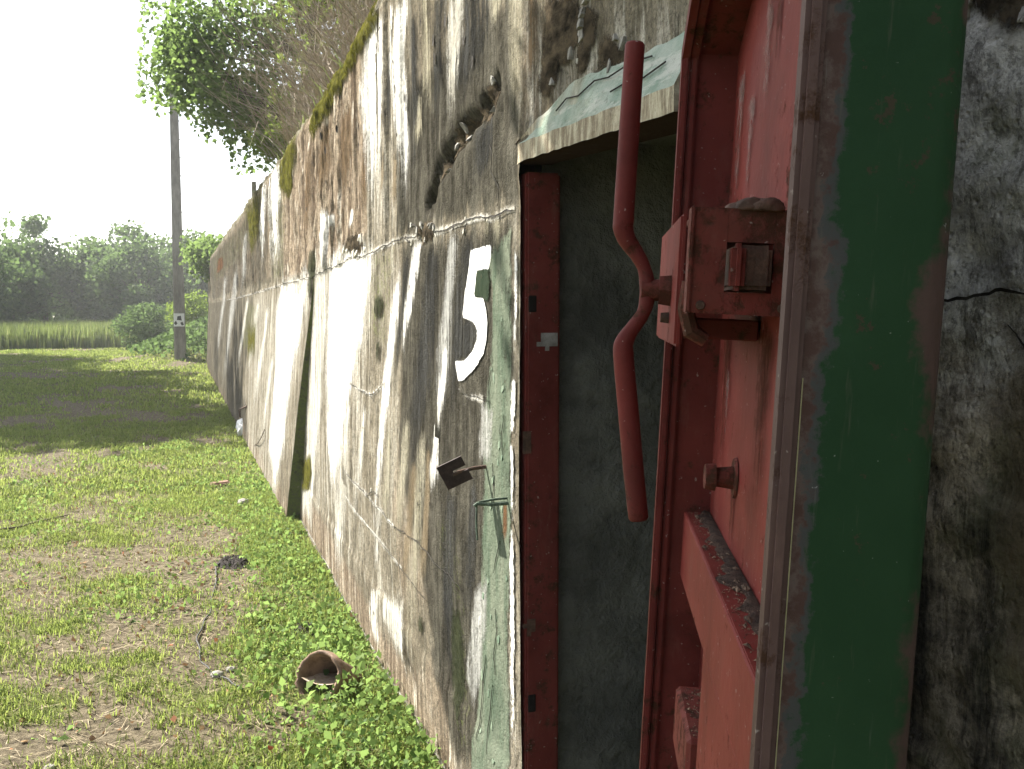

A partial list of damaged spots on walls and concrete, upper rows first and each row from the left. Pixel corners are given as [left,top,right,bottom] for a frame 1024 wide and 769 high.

spalling [440,76,501,182]
damp [218,0,499,582]
crack [228,142,514,300]
crack [944,288,1024,302]